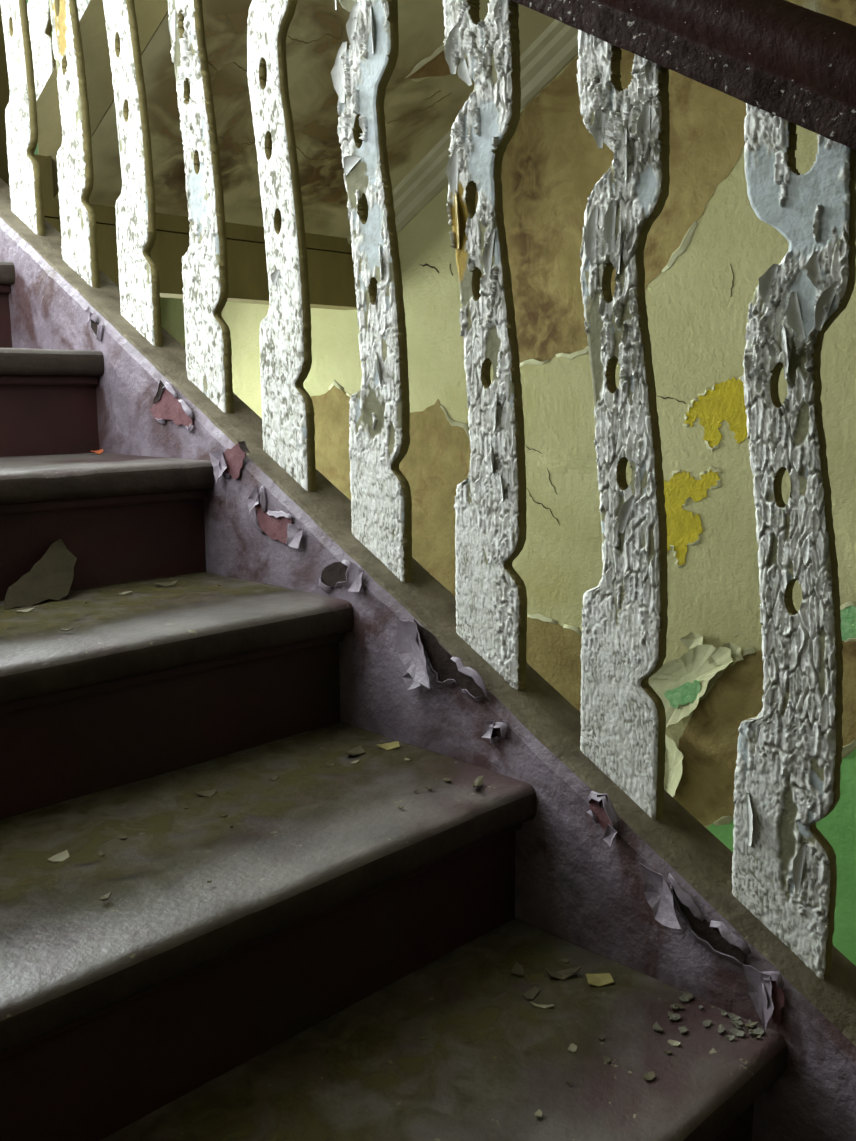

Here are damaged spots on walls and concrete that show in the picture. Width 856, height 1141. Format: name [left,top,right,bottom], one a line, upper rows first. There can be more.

peeling [786,0,856,26]
peeling [480,49,747,367]
water stain [522,303,558,350]
peeling [780,251,840,379]
peeling [209,441,250,484]
spalling [311,380,352,500]
spalling [399,399,471,596]
peeling [397,619,490,702]
spalling [526,613,582,713]
peeling [648,632,764,846]
peeling [842,638,856,759]
peeling [639,863,785,1032]